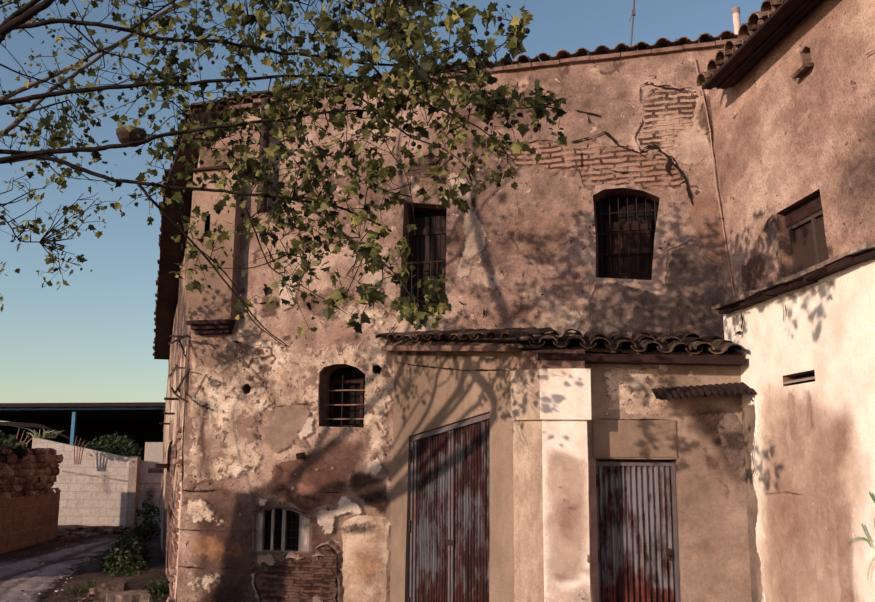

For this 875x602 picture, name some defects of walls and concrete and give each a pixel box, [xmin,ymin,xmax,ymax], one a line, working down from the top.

peeling [501,80,705,196]
crack [572,110,693,205]
peeling [232,341,273,385]
peeling [258,405,309,459]
water stain [692,410,730,468]
peeling [741,398,758,456]
peeling [165,437,184,596]
peeling [216,488,262,516]
water stain [196,440,387,602]
water stain [761,393,861,602]
peeling [251,540,345,602]